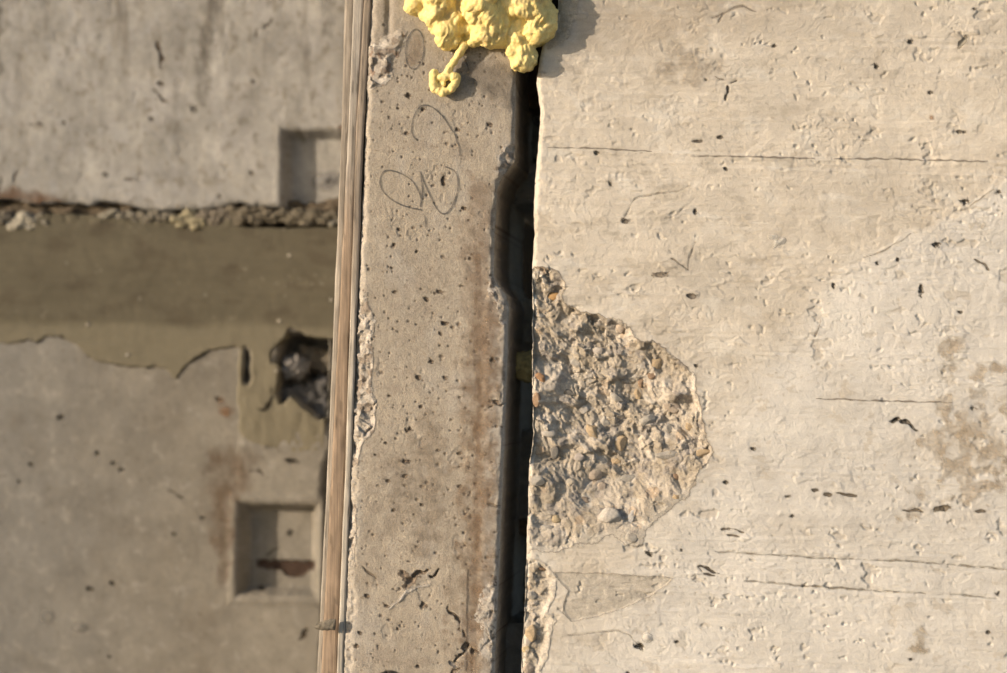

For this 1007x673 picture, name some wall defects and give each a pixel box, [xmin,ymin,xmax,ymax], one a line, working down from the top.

spalling [280,343,330,419]
spalling [522,266,713,673]